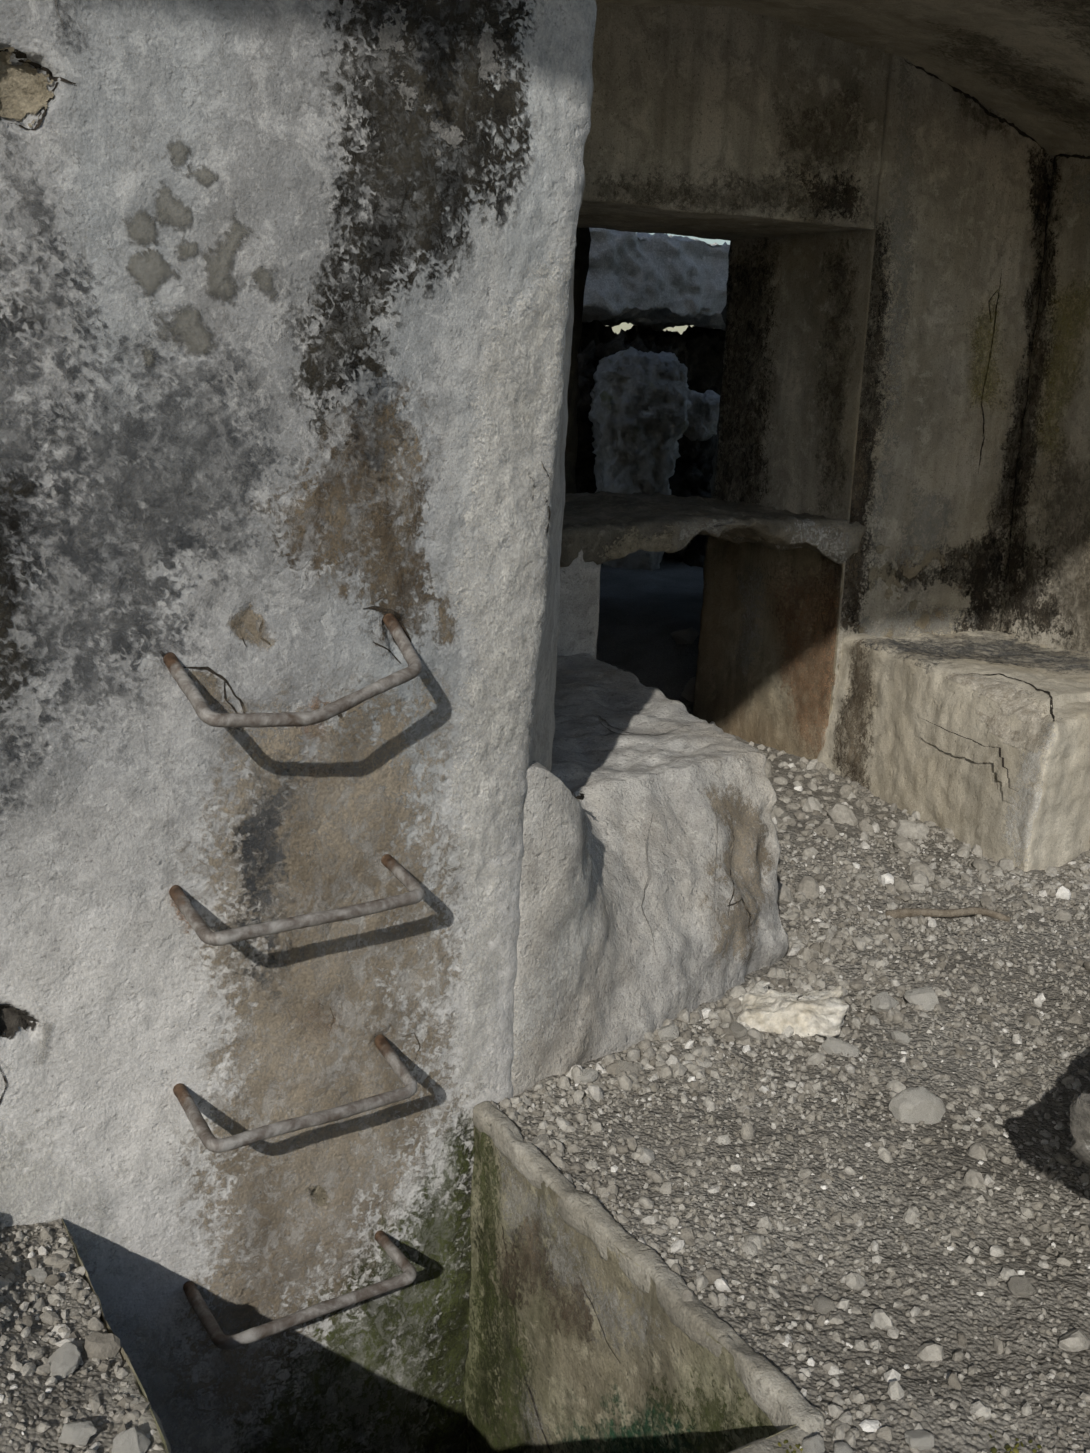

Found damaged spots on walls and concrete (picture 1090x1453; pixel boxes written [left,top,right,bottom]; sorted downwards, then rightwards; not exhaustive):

spalling [0,47,76,130]
crack [904,59,1090,210]
water stain [0,0,536,813]
water stain [597,61,1090,674]
spalling [0,1004,52,1064]